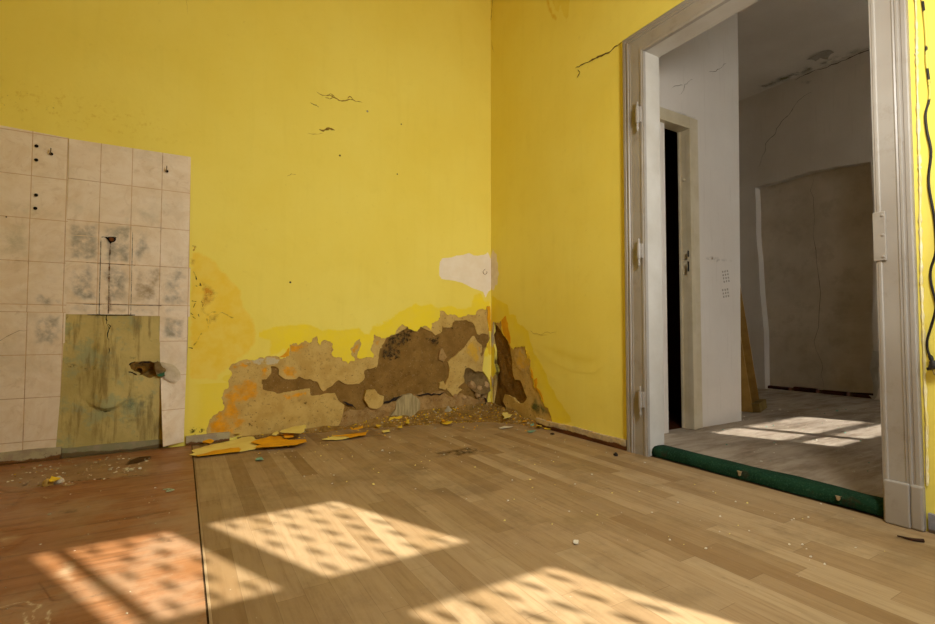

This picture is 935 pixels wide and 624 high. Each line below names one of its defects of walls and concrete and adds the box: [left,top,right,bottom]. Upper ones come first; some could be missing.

peeling [196,246,552,461]